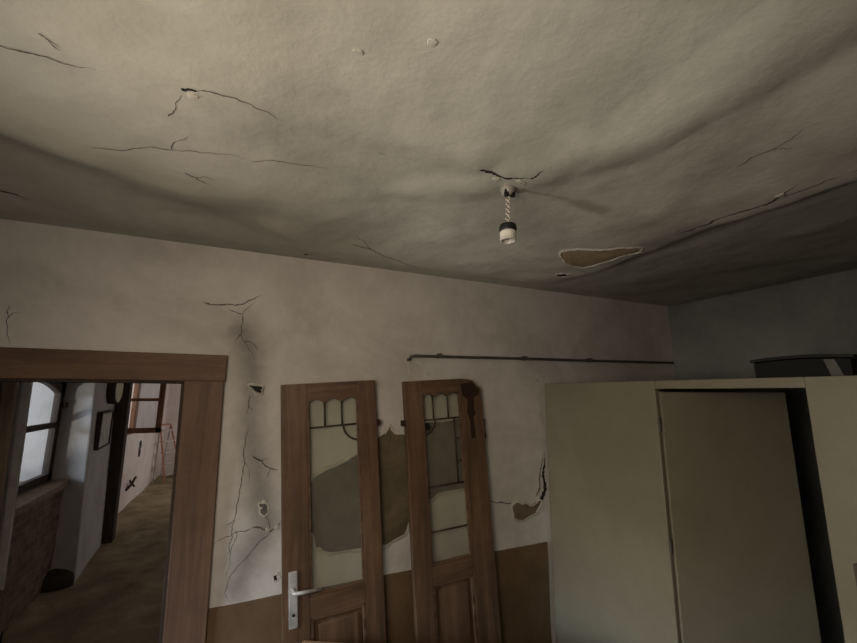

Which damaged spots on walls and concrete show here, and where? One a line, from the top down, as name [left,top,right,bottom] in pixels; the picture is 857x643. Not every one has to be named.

crack [0,33,91,69]
crack [168,88,277,119]
crack [102,136,321,168]
crack [480,169,542,185]
crack [676,170,857,235]
spalling [555,246,645,277]
crack [204,295,261,359]
crack [215,395,280,603]
spalling [310,450,361,557]
spalling [377,423,409,549]
spalling [425,416,464,504]
spalling [491,450,547,523]